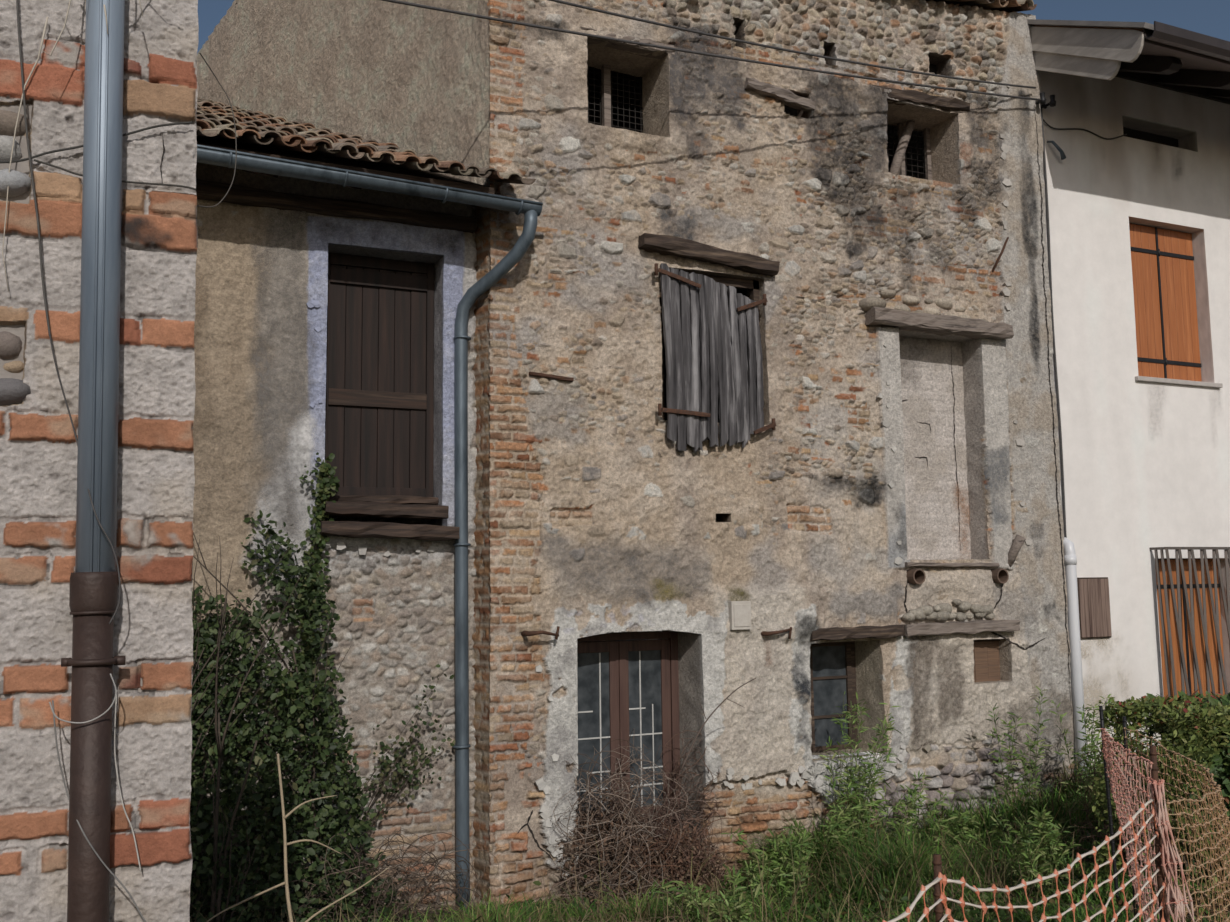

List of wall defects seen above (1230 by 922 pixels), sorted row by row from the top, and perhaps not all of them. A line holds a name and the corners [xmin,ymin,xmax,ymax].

leakage [795,71,888,235]
leakage [846,241,867,258]
leakage [1022,169,1037,274]
leakage [1030,290,1039,359]
leakage [857,475,883,506]
spalling [702,731,1026,877]